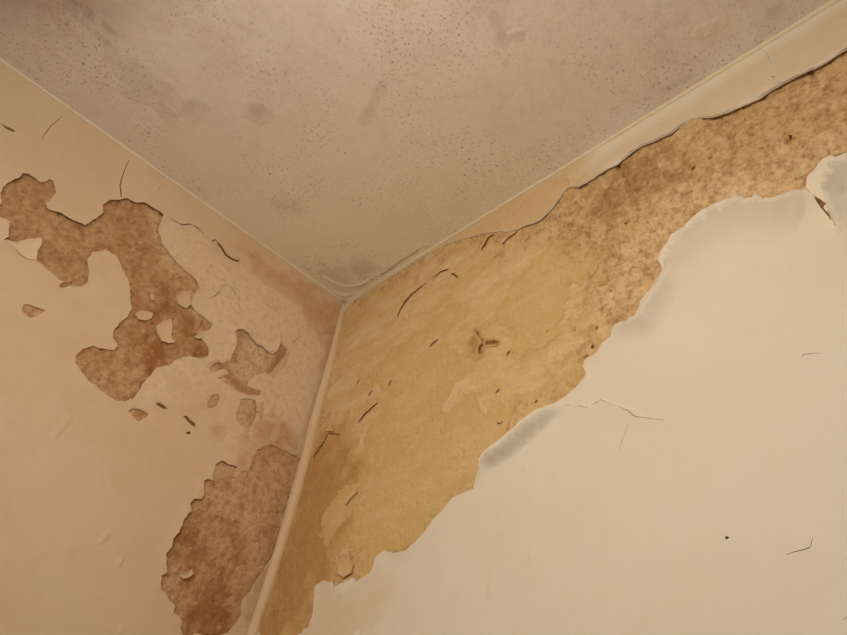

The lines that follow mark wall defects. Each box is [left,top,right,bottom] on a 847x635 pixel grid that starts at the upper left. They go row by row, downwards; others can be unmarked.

crack [178,223,239,262]
peeling [345,49,847,311]
crack [813,194,835,225]
flaking render [0,173,212,421]
crack [397,269,458,317]
water stain [256,0,847,635]
peeling [606,299,639,324]
peeling [211,329,287,428]
flaking render [161,444,300,635]